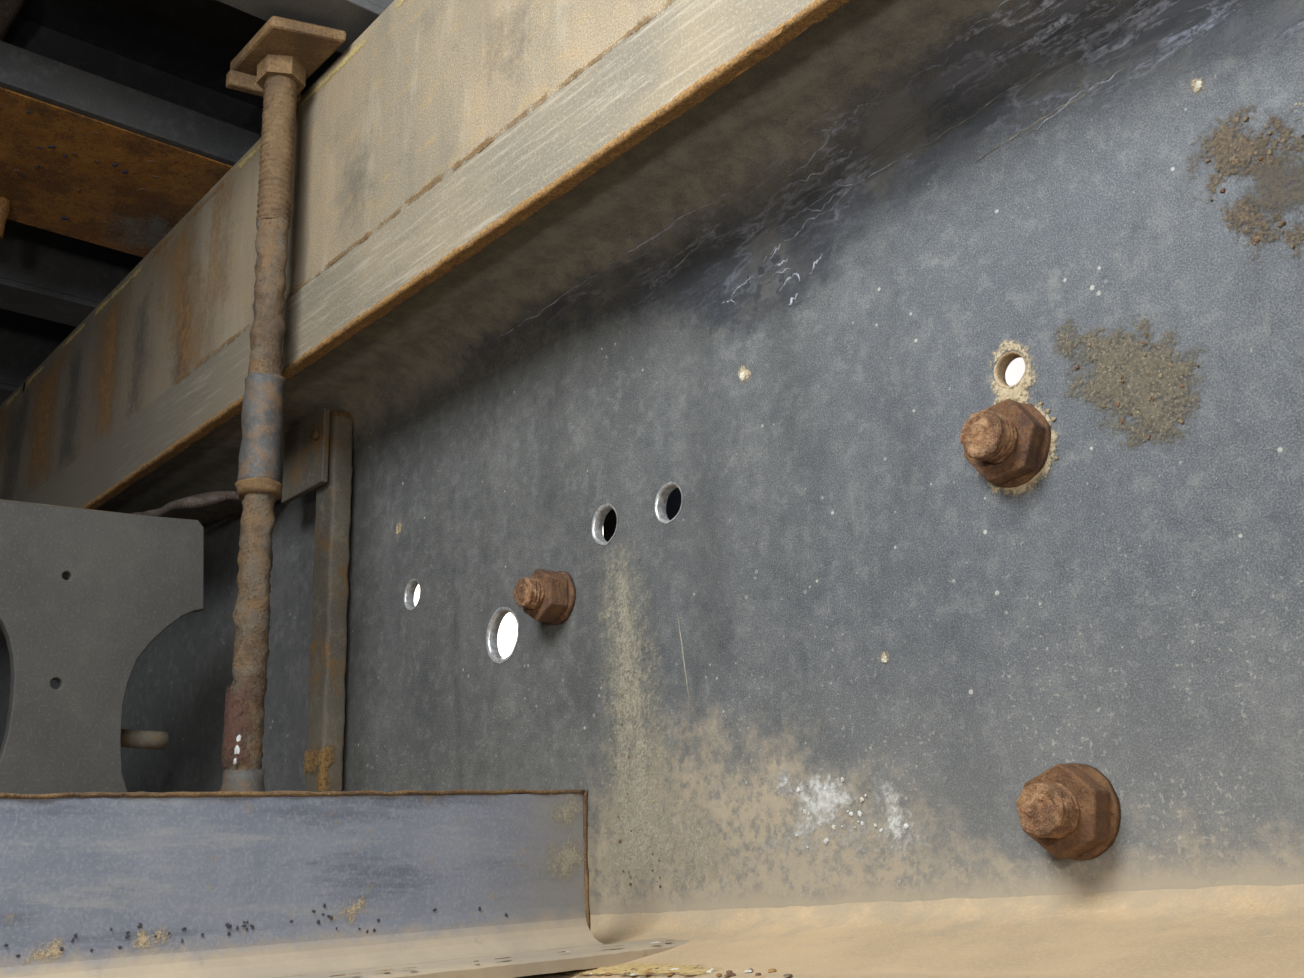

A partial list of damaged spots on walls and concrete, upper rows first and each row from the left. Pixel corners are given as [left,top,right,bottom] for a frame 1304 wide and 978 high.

corrosion [281,0,850,381]
corrosion [1186,103,1304,258]
corrosion [63,235,172,348]
corrosion [1053,318,1205,449]
corrosion [81,395,244,510]
damp [778,776,910,850]